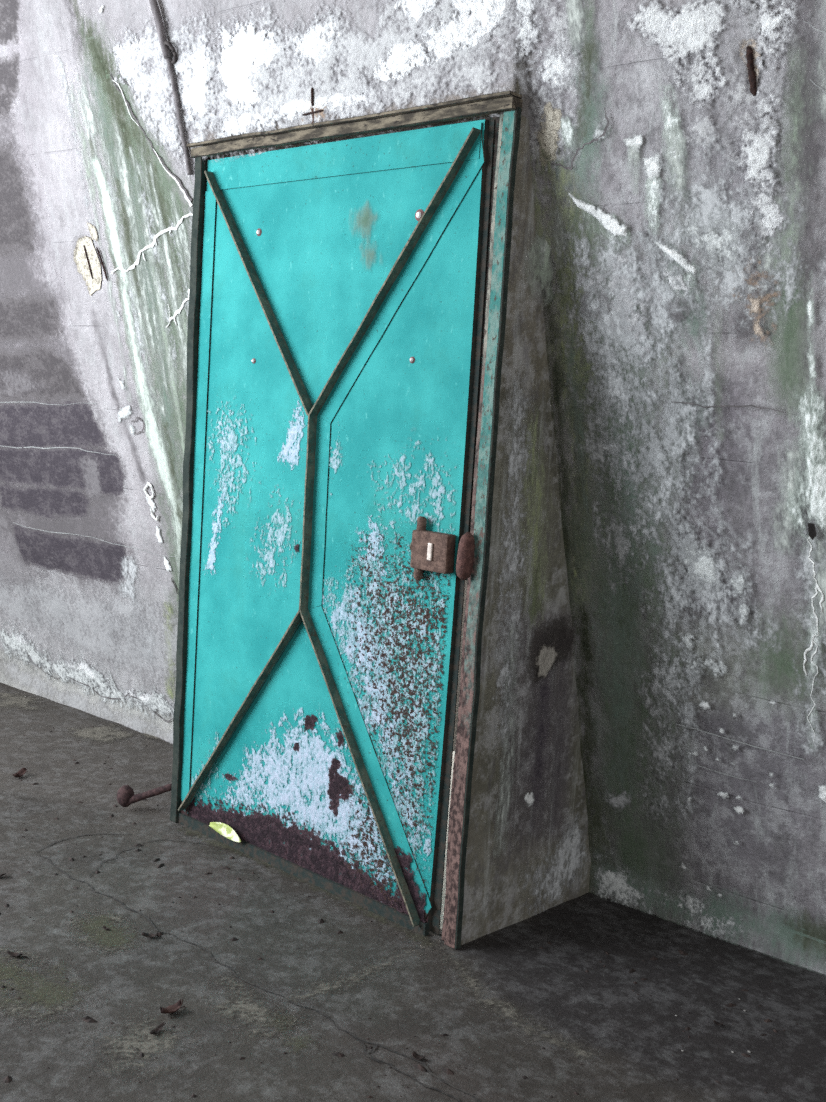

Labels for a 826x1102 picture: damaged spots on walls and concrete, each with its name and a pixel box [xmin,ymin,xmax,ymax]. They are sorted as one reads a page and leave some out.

spalling [73,222,108,296]
damp [0,0,192,604]
crack [110,70,192,275]
crack [166,289,190,328]
damp [561,0,593,147]
peeling [627,0,809,196]
damp [526,61,826,908]
damp [0,603,175,720]
damp [69,724,160,742]
damp [492,383,531,848]